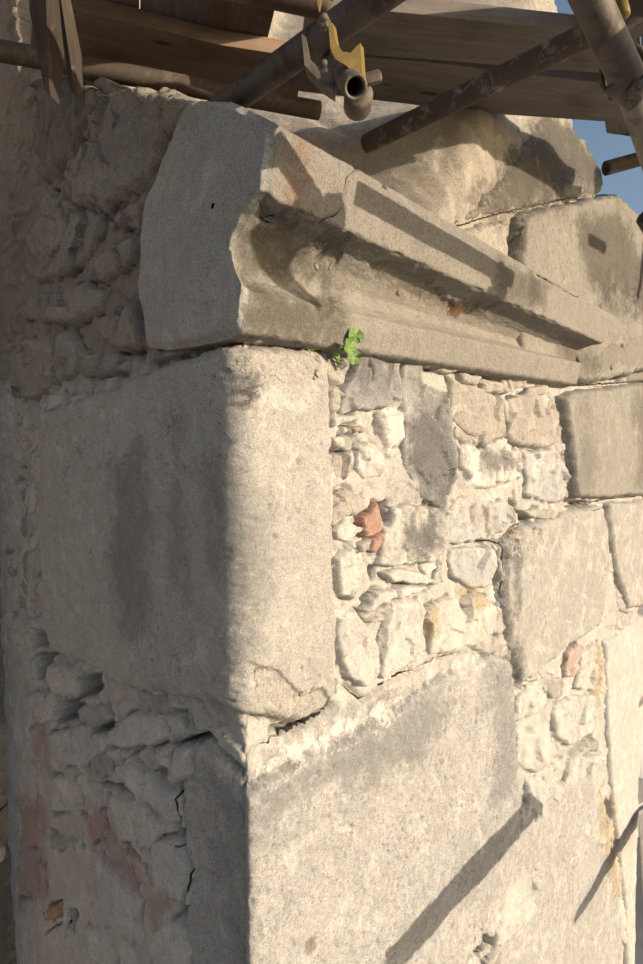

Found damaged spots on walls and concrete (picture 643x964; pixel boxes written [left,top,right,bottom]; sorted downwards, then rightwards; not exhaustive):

damp [470,117,603,222]
crack [456,194,594,254]
rust [448,299,466,317]
crack [475,500,519,596]
crack [259,708,325,744]